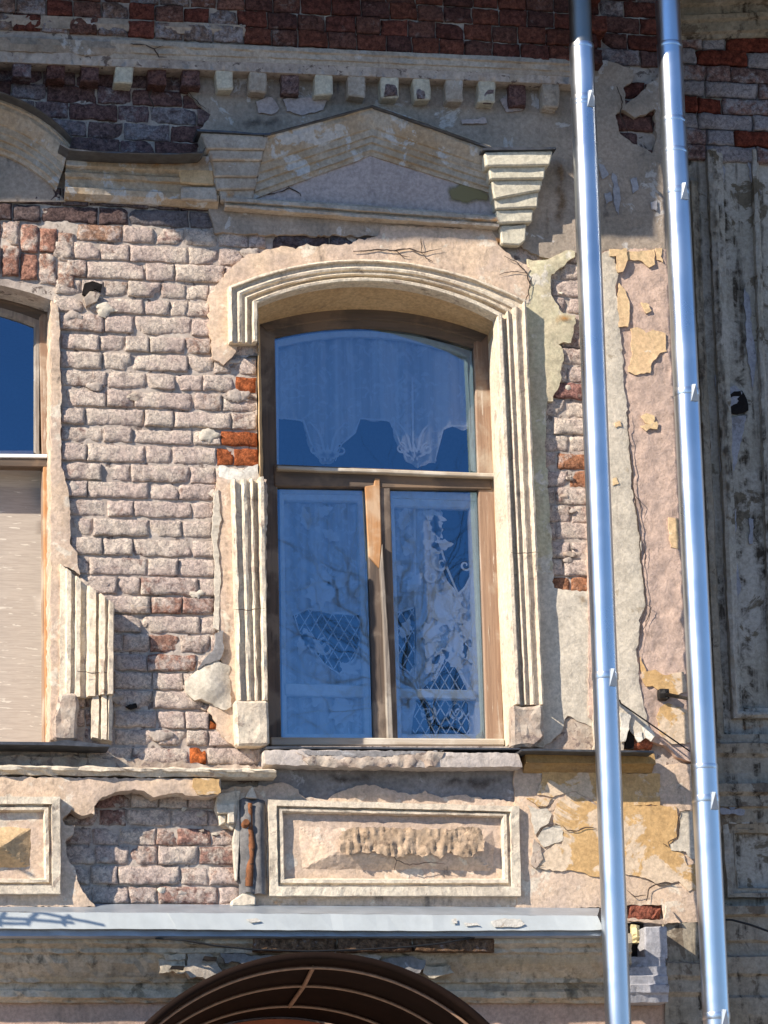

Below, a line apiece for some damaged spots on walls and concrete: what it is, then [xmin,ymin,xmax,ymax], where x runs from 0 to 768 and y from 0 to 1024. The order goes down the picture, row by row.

spalling [591,0,658,68]
spalling [616,82,655,153]
crack [353,242,438,262]
crack [500,256,533,299]
peeling [609,248,667,375]
spalling [0,188,367,765]
spalling [545,253,587,592]
crack [627,414,652,654]
peeling [668,517,679,549]
spalling [63,778,239,905]
peeling [525,772,600,877]
peeling [622,773,696,892]